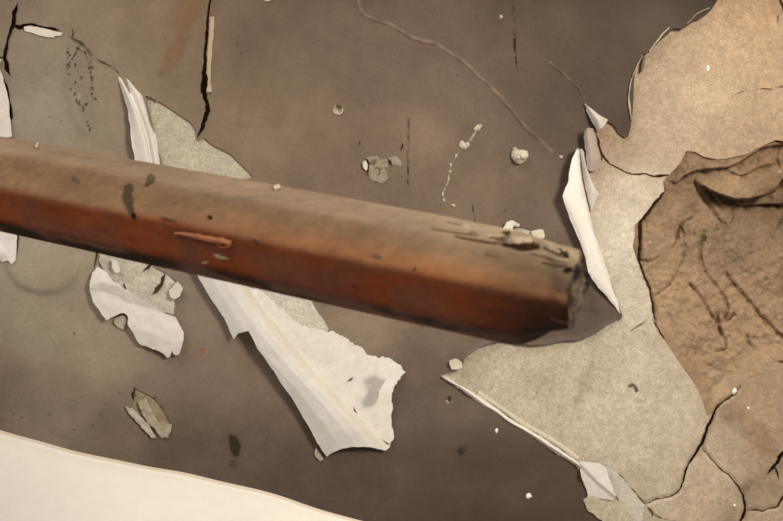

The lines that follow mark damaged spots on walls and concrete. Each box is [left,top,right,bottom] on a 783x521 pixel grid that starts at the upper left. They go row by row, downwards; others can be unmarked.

peeling [0,59,12,138]
crack [0,3,118,120]
peeling [118,77,253,179]
crack [197,0,214,138]
spalling [362,142,404,183]
peeling [0,232,19,264]
peeling [90,253,184,358]
peeling [441,0,783,521]
peeling [125,387,172,438]
peeling [197,275,405,461]
crack [619,389,783,521]